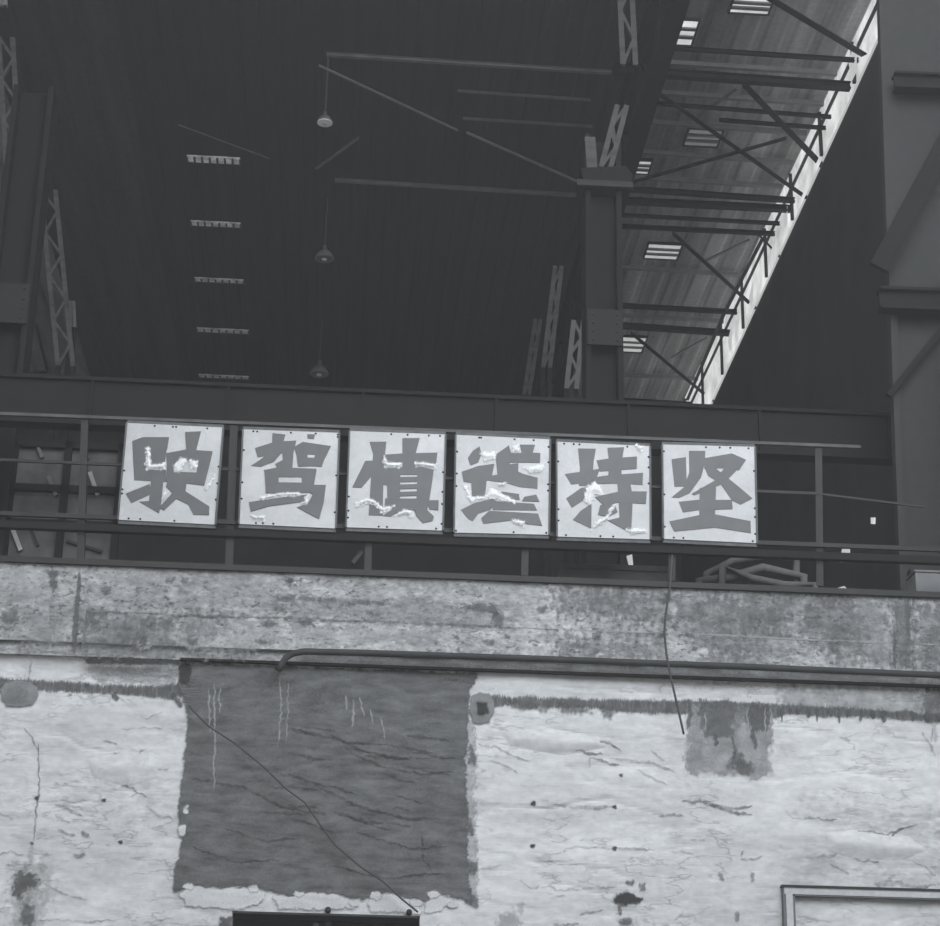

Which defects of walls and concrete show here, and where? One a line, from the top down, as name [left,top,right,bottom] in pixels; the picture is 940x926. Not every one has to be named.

crack [576,742,620,765]
peeling [178,805,189,836]
peeling [464,715,479,907]
crack [659,800,752,817]
peeling [179,883,458,915]